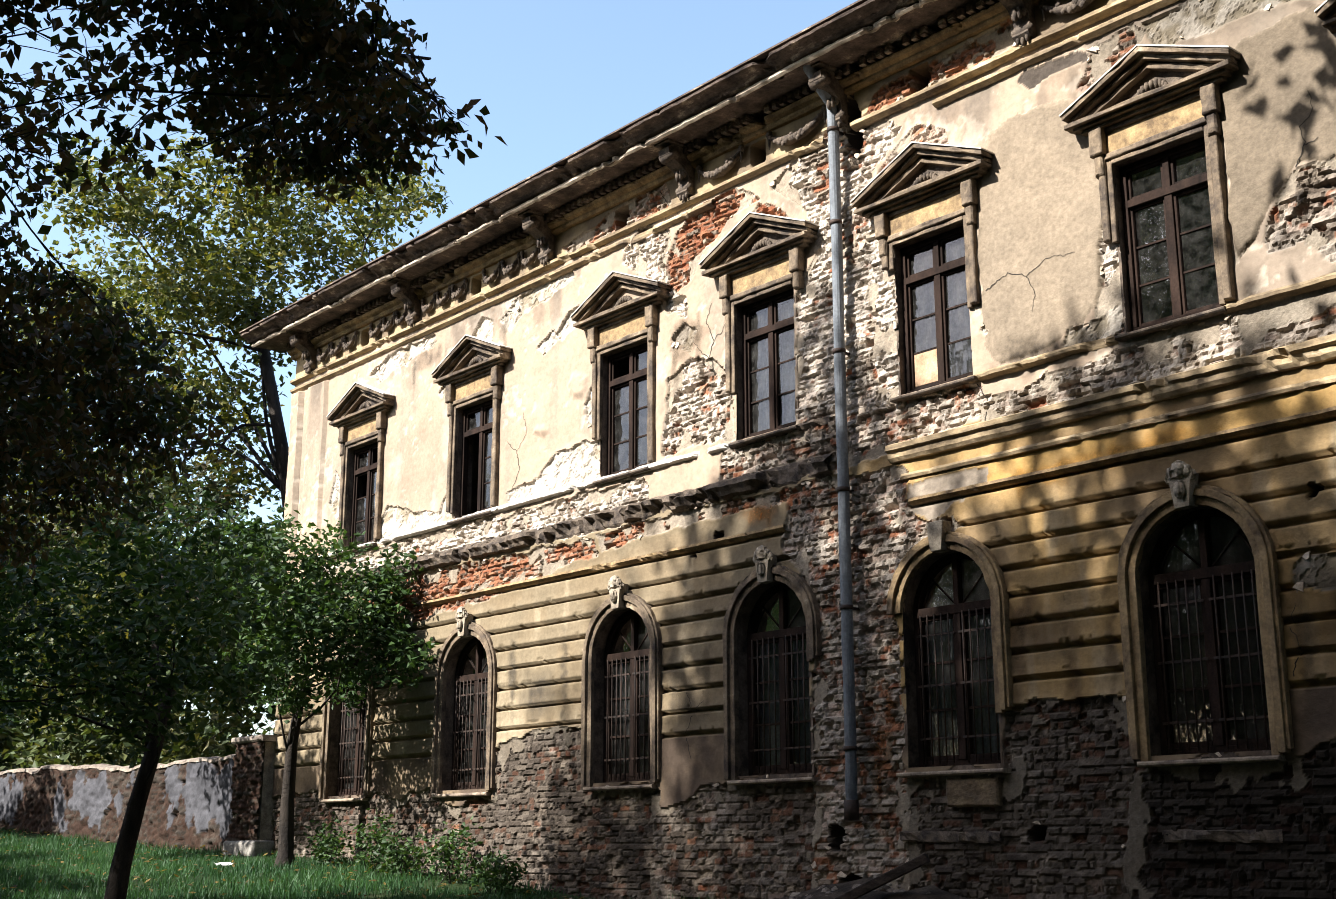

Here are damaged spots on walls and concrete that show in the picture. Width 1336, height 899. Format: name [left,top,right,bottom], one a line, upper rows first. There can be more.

crack [1295,90,1318,167]
crack [986,252,1072,308]
spalling [271,17,1336,899]
peeling [0,773,25,824]
peeling [53,768,136,832]
peeling [163,759,234,841]